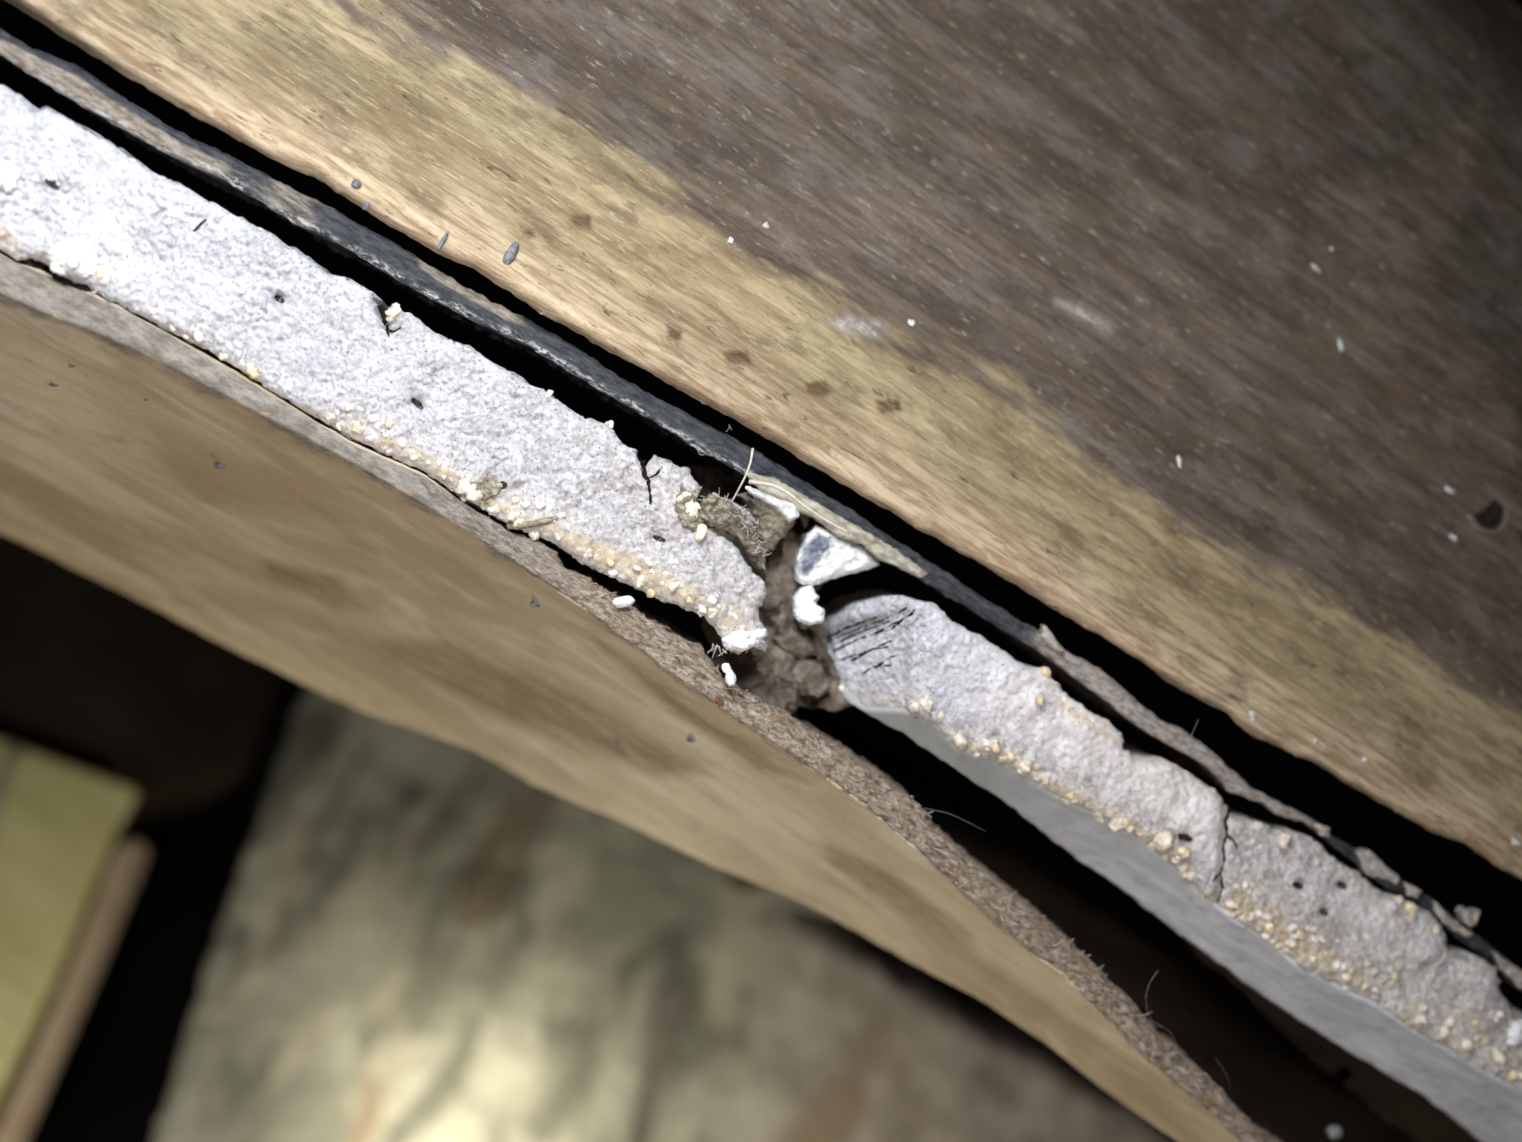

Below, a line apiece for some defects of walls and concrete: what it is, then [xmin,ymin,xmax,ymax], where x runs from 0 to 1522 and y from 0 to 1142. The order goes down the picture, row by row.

spalling [674,482,707,542]
peeling [743,472,928,578]
crack [1210,807,1238,903]